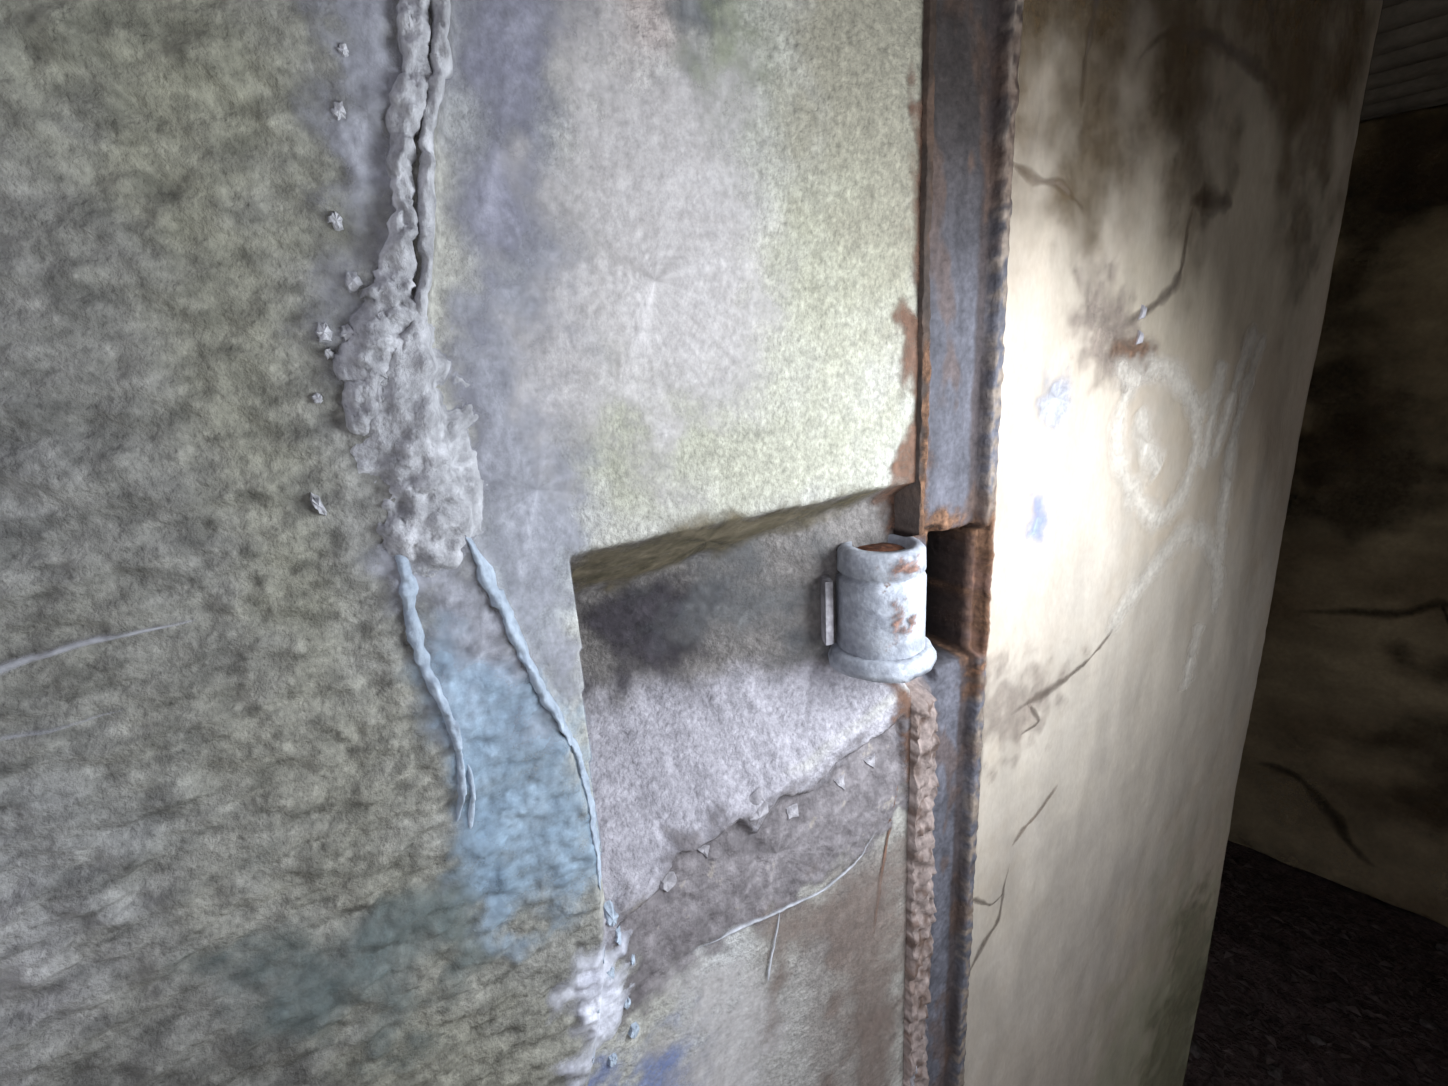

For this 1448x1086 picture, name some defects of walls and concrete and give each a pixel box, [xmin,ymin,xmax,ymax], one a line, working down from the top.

water stain [1019,0,1137,95]
water stain [1236,0,1368,167]
corrosion [910,102,923,284]
crack [1130,236,1187,321]
water stain [1342,158,1448,263]
crack [0,625,173,673]
water stain [315,0,797,1086]
corrosion [873,303,996,634]
corrosion [943,646,987,696]
crack [1340,602,1448,623]
spalling [614,719,911,1021]
corrosion [875,683,911,922]